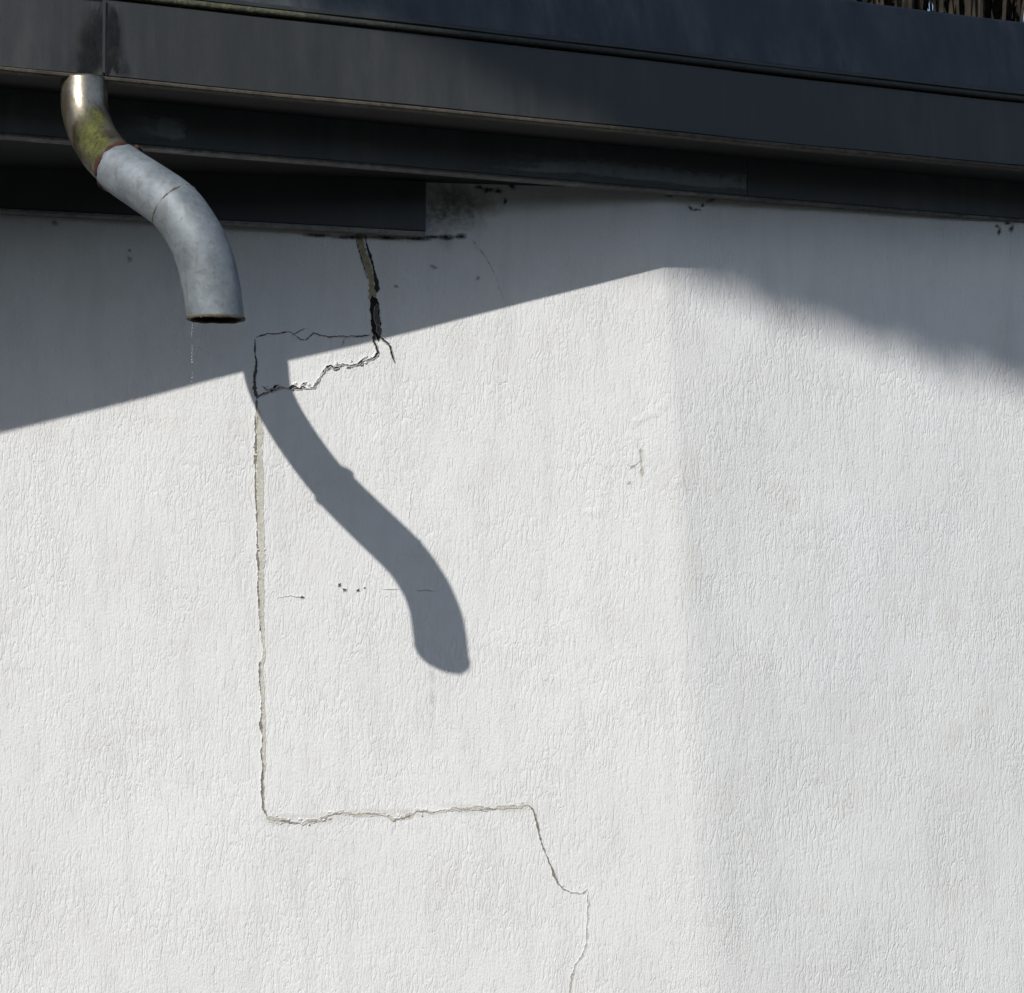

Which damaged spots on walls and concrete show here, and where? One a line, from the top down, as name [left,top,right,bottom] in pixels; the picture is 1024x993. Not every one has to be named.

crack [251,234,589,993]